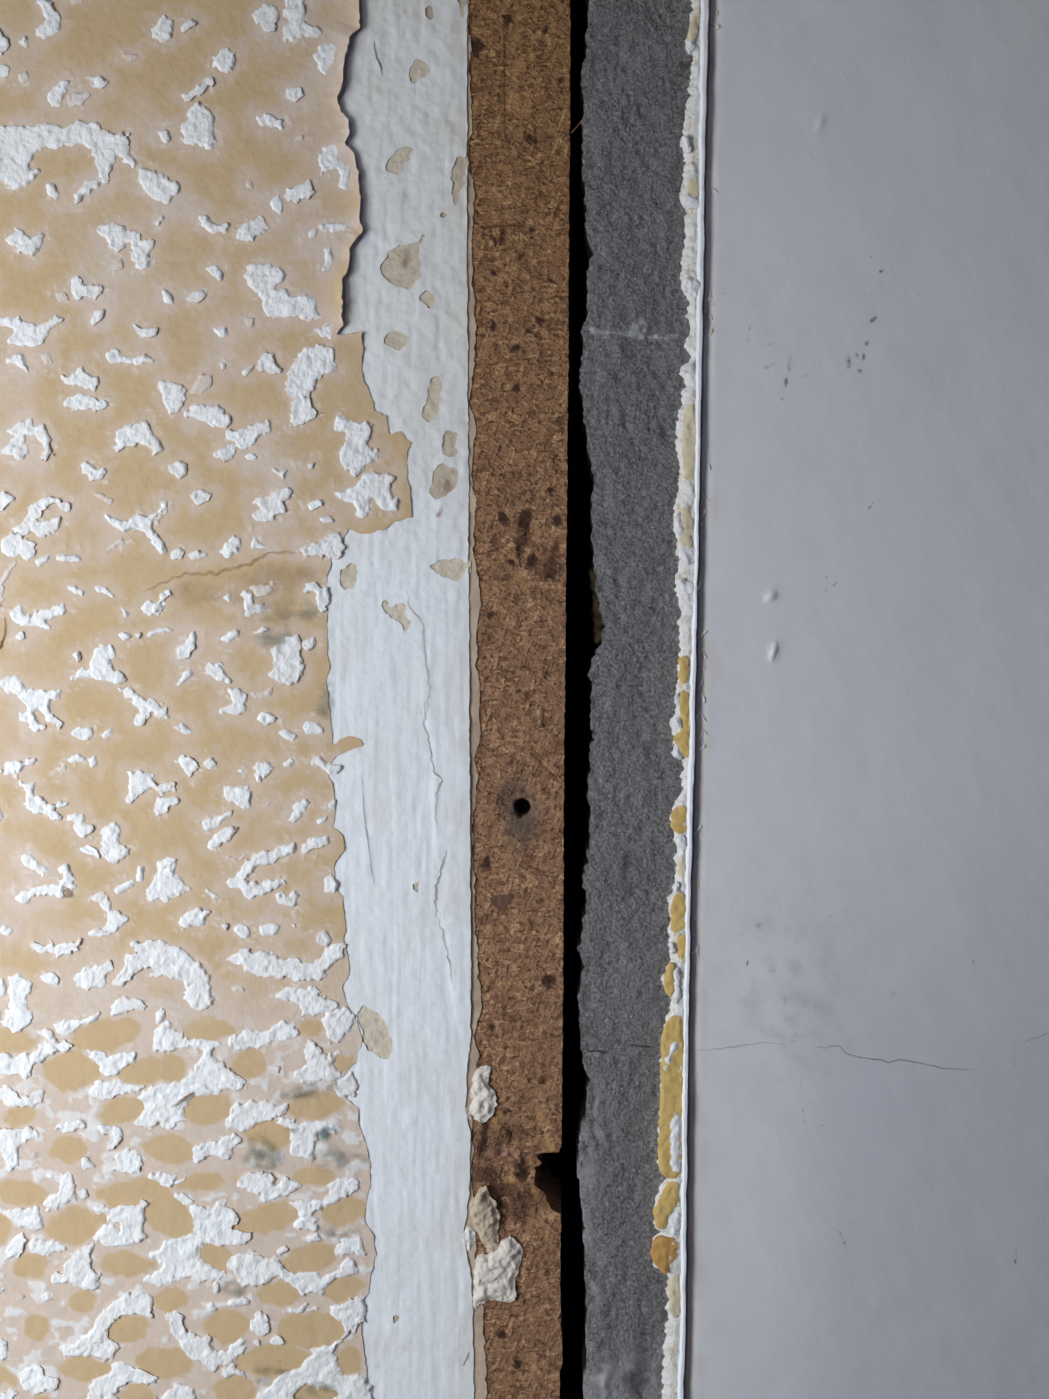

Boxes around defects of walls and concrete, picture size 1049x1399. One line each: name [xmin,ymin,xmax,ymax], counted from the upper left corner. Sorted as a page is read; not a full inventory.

peeling [0,0,82,83]
peeling [151,14,197,43]
peeling [252,0,336,75]
peeling [158,48,235,150]
peeling [198,134,351,242]
peeling [0,76,180,412]
peeling [380,235,436,309]
peeling [0,418,54,461]
peeling [79,362,293,560]
peeling [242,263,399,613]
peeling [0,490,324,772]
peeling [0,755,393,1399]